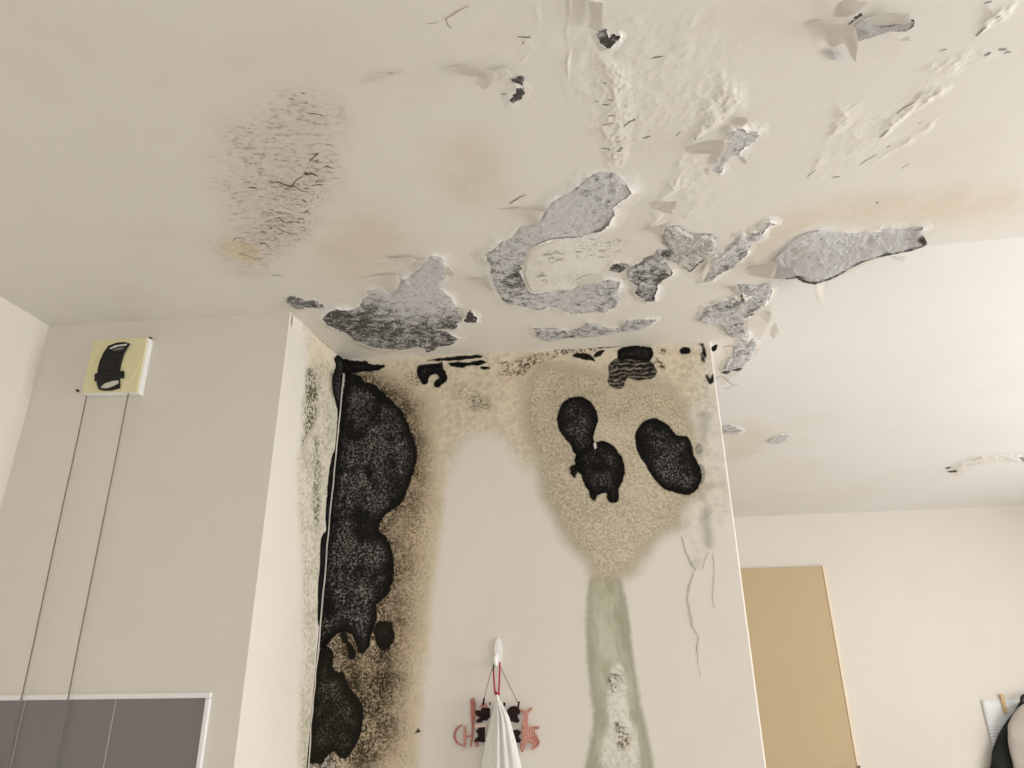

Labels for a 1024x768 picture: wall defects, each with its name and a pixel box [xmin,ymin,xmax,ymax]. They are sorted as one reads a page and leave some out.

peeling [805,0,915,62]
peeling [687,116,771,177]
peeling [280,162,934,374]
water stain [417,362,447,387]
water stain [449,360,487,368]
water stain [572,352,595,361]
water stain [557,396,625,503]
mould [635,418,705,495]
peeling [943,453,1024,476]
water stain [286,347,338,768]